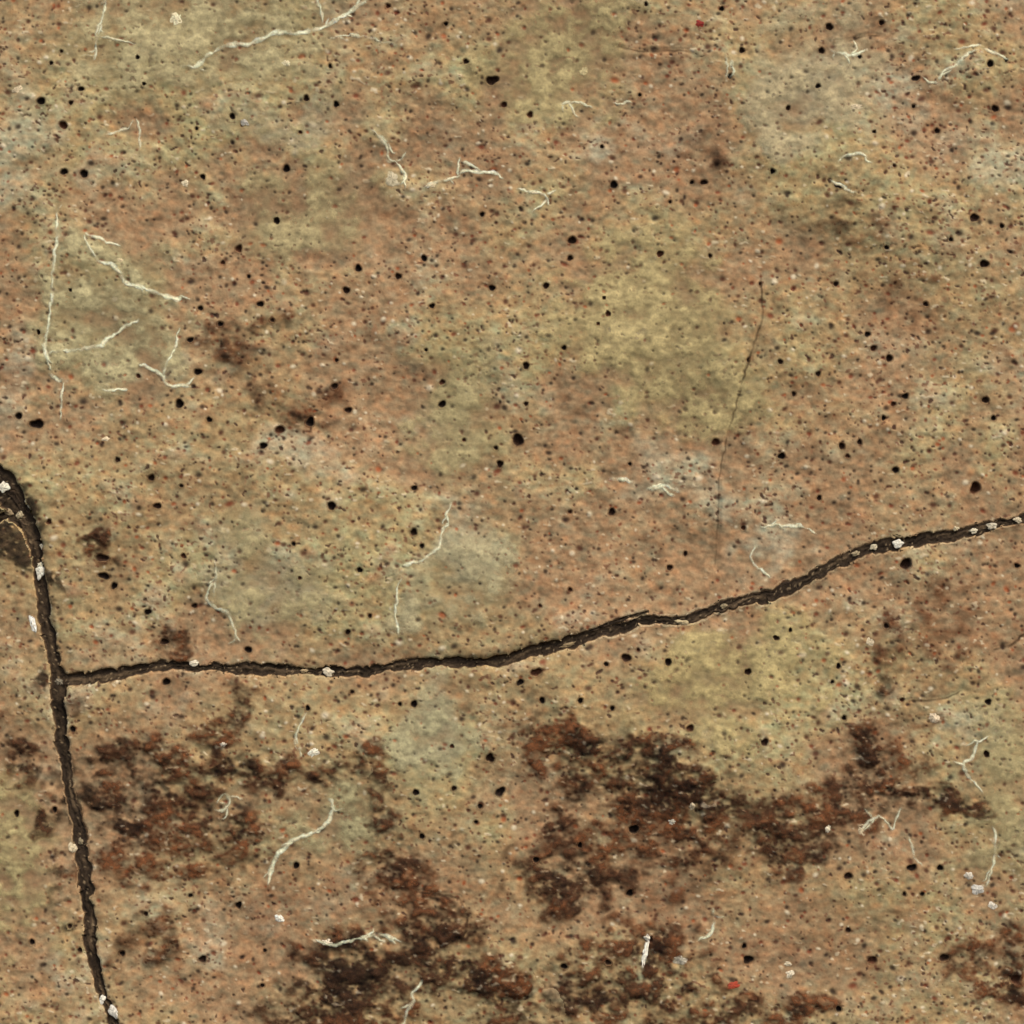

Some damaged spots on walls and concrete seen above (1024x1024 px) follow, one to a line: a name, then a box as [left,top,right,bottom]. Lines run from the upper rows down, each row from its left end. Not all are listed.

damp [641,614,802,708]
crack [0,462,1024,1024]
damp [691,719,733,755]
damp [328,780,383,857]